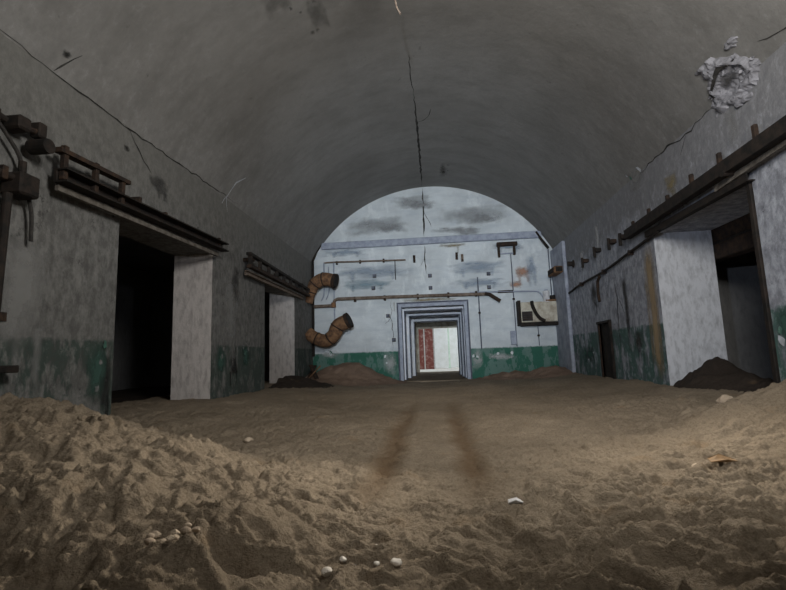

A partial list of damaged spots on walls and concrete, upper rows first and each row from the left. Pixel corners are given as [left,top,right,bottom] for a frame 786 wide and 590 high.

spalling [695,36,762,117]
crack [409,57,431,274]
crack [641,110,709,173]